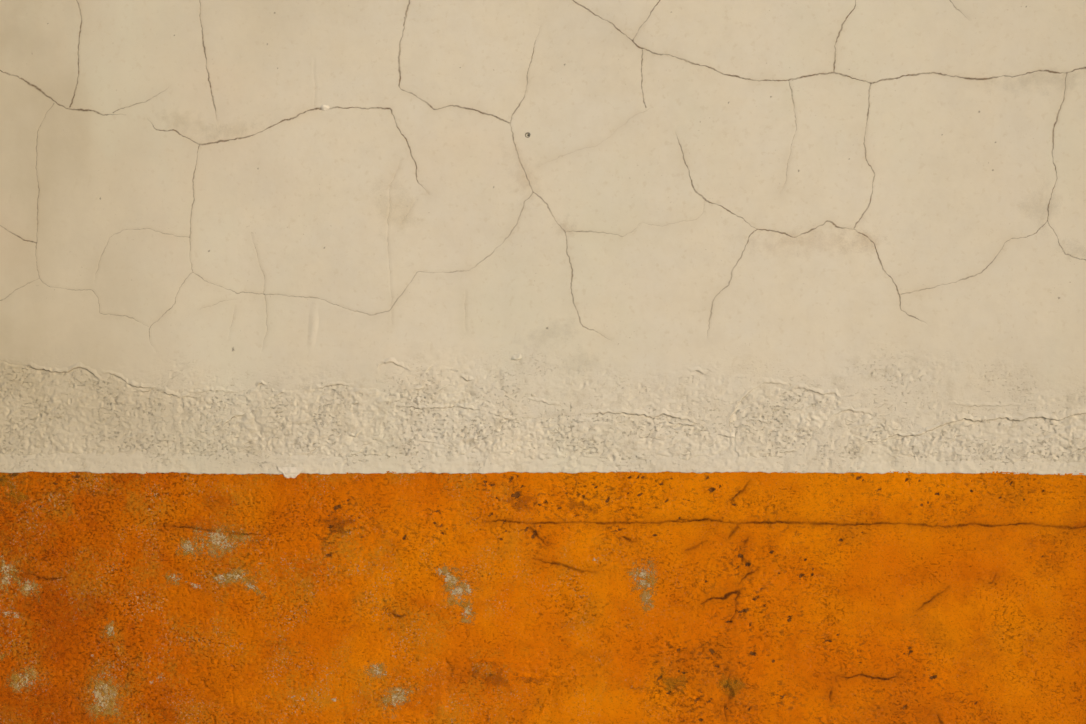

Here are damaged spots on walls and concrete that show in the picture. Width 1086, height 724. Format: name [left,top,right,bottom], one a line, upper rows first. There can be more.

crack [0,22,114,115]
crack [573,0,1086,239]
spalling [0,357,841,461]
spalling [871,400,1086,463]